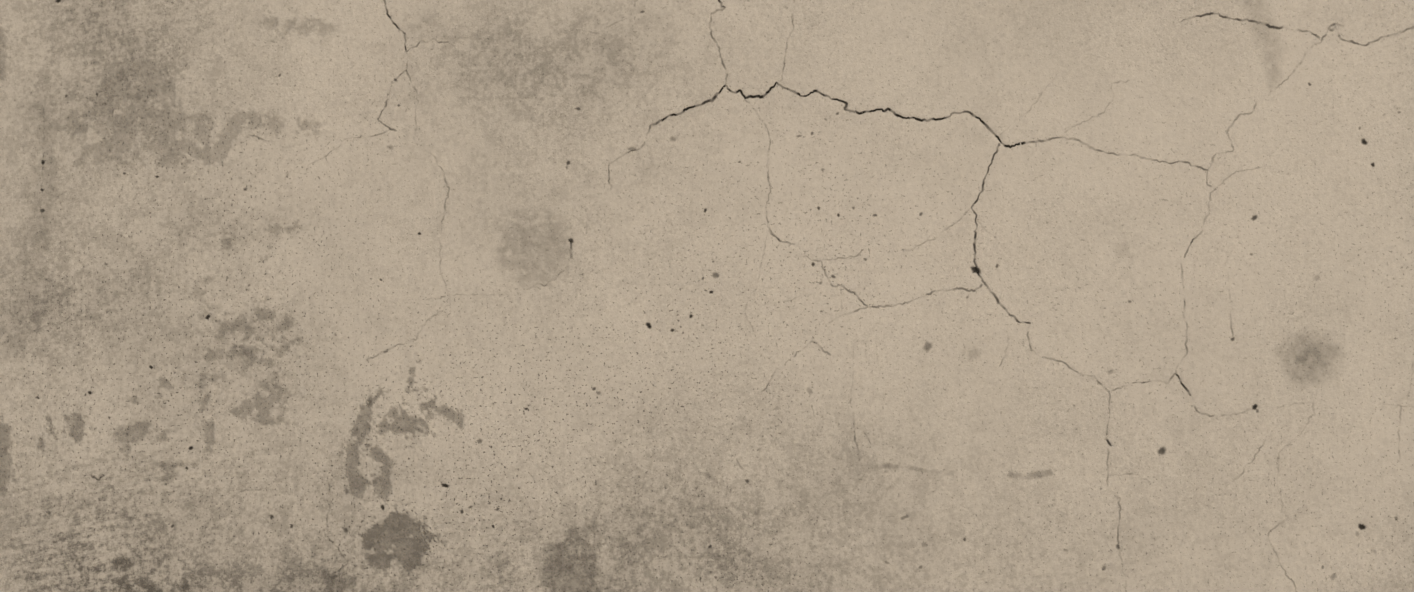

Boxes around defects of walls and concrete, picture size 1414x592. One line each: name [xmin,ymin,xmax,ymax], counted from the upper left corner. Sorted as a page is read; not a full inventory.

crack [1197,13,1316,36]
crack [656,82,1030,324]